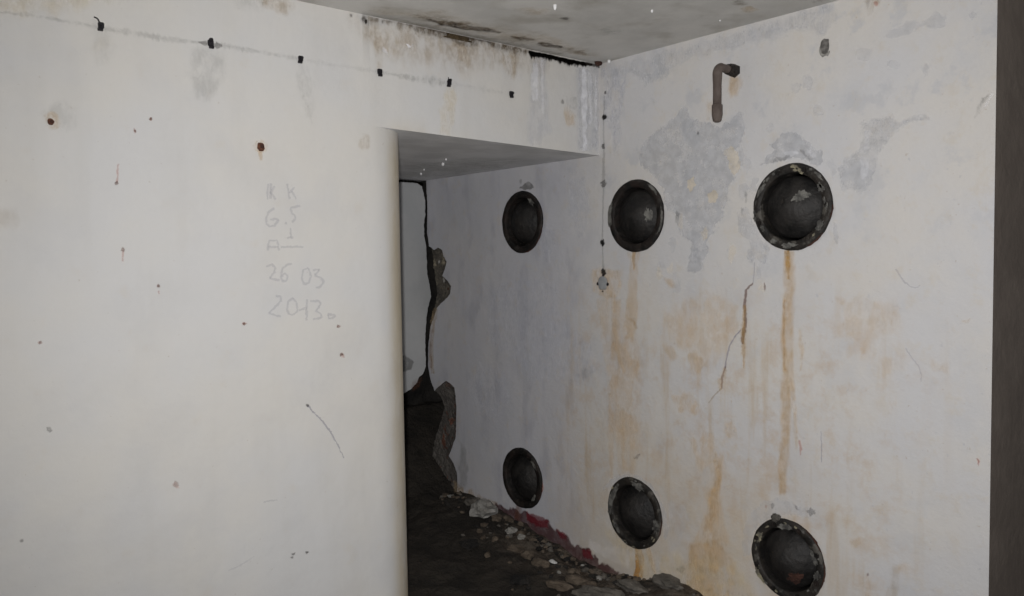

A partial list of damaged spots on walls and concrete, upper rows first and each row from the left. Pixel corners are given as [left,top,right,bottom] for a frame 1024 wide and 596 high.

water stain [428,19,526,48]
peeling [644,207,663,233]
spalling [431,248,451,324]
spalling [432,381,457,492]